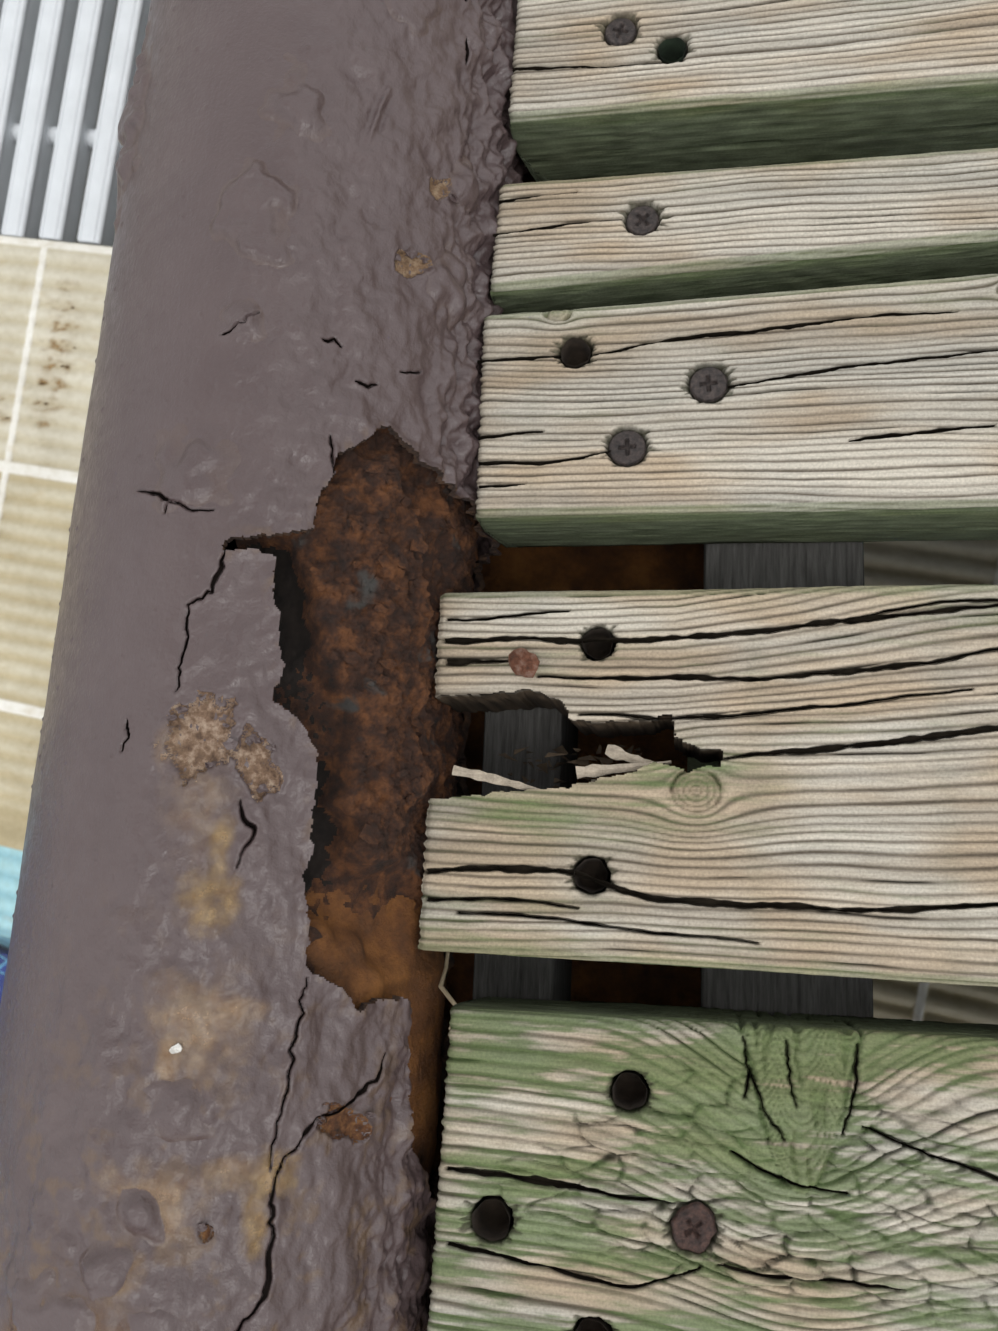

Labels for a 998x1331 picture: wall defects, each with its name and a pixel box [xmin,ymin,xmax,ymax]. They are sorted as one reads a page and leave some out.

crack [463,38,471,65]
crack [139,491,214,513]
crack [176,549,226,691]
crack [237,802,256,866]
corrosion [308,926,323,944]
crack [237,978,386,1331]